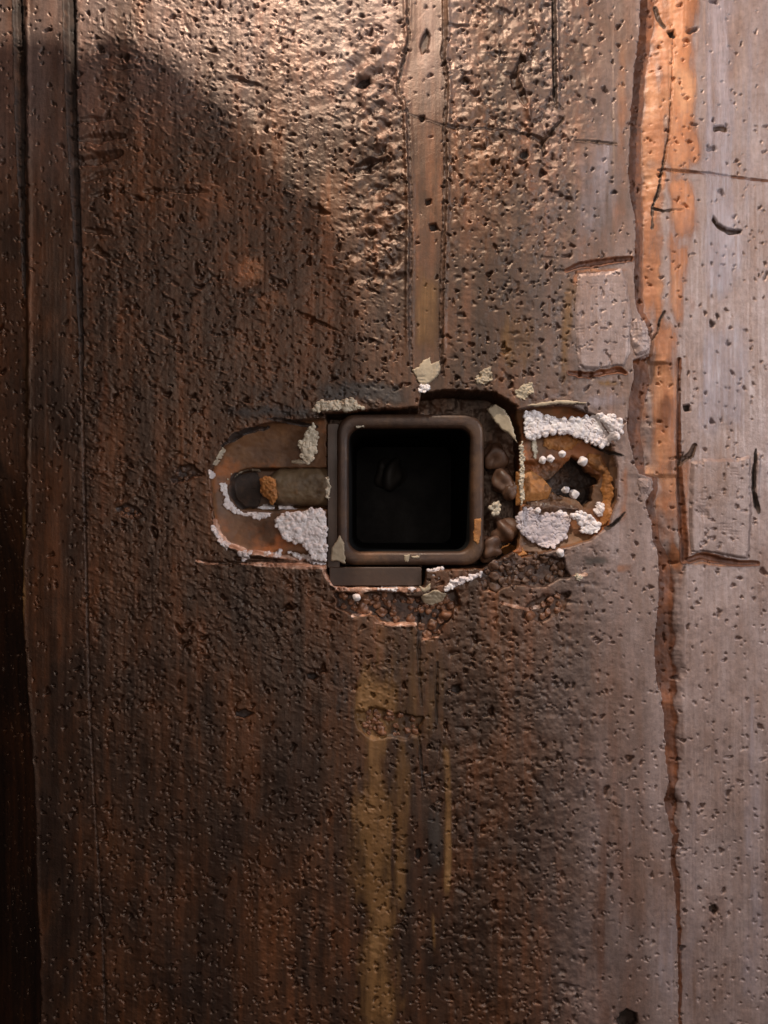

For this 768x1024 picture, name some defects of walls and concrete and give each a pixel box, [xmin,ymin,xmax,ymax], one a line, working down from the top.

corrosion [653,0,700,514]
peeling [487,405,517,442]
corrosion [543,434,582,451]
corrosion [526,499,579,513]
crack [392,0,768,1024]
corrosion [586,453,627,526]
water stain [212,519,304,562]
peeling [331,535,346,564]
spalling [479,551,571,622]